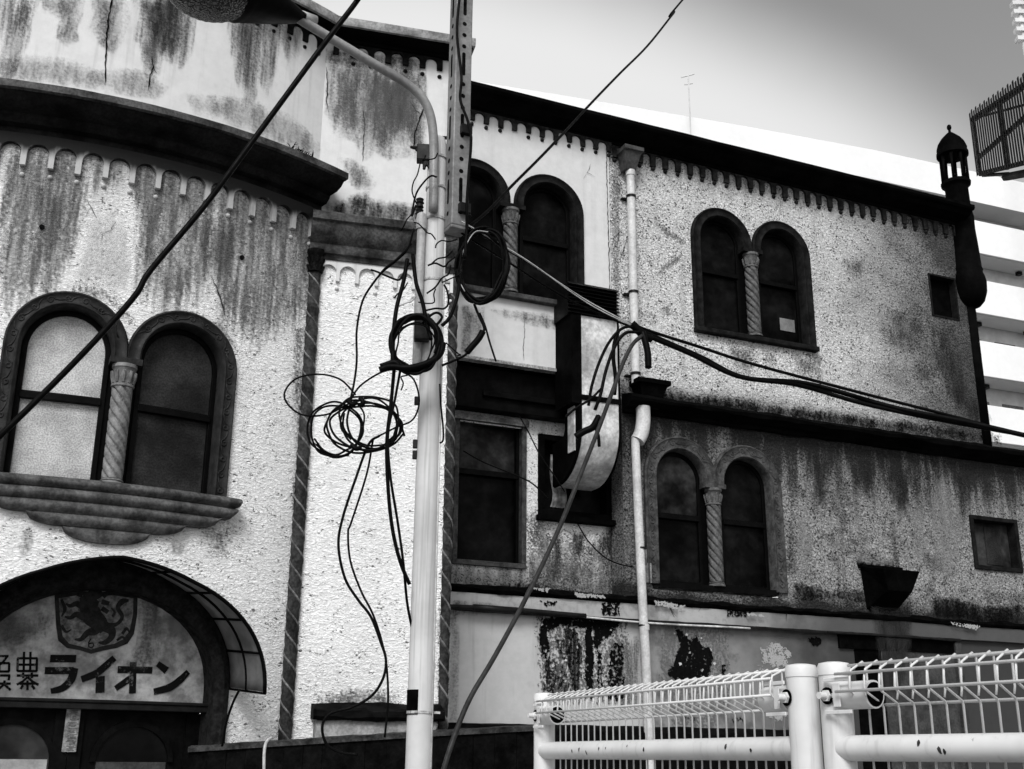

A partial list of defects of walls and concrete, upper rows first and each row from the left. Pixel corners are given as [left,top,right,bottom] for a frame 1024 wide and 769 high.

leakage [1,0,103,83]
crack [104,0,116,82]
leakage [140,0,194,70]
leakage [231,23,301,138]
leakage [328,51,426,156]
leakage [328,163,417,221]
leakage [0,147,309,438]
peeling [533,588,630,705]
spalling [654,600,685,610]
peeling [660,625,743,728]
leakage [789,518,911,687]
leakage [930,597,1021,624]